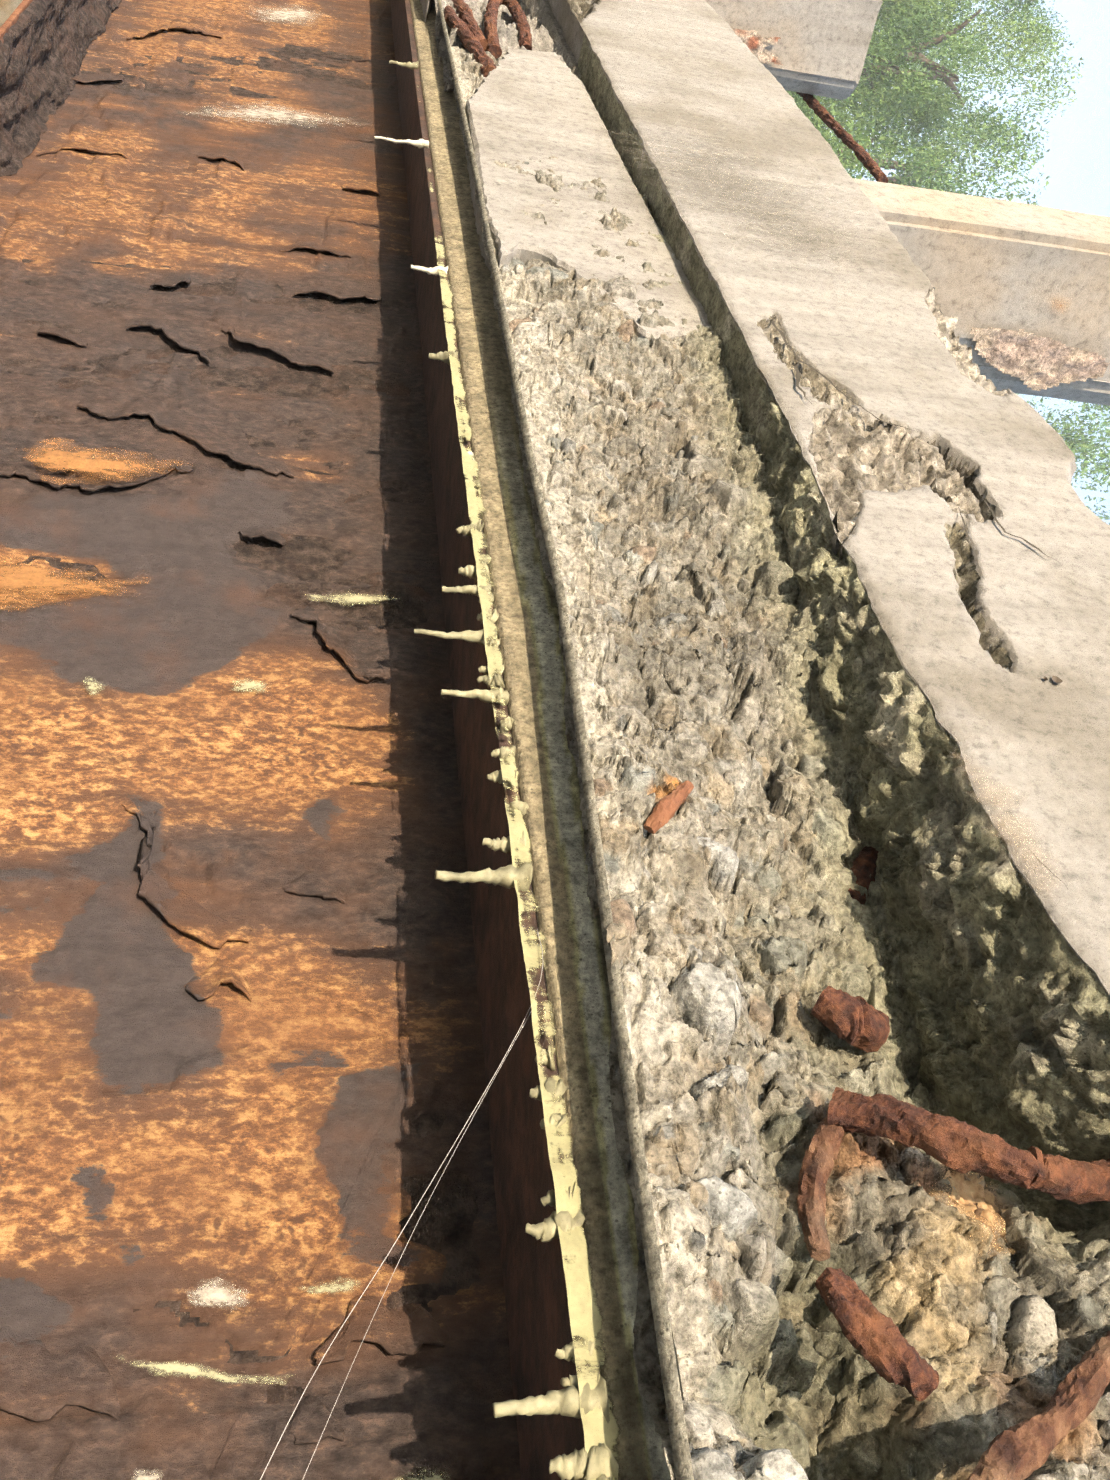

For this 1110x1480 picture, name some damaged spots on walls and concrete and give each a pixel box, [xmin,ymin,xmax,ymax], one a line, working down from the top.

rust [150,274,191,287]
rust [222,321,334,374]
crack [770,316,919,432]
rust [0,397,295,492]
rust [237,526,286,546]
crack [958,500,1057,561]
rust [0,554,146,610]
spalling [434,0,1110,1480]
efflorescence [434,236,620,1462]
rust [122,798,254,1002]
rust [941,1170,1006,1236]
rust [313,1295,449,1366]